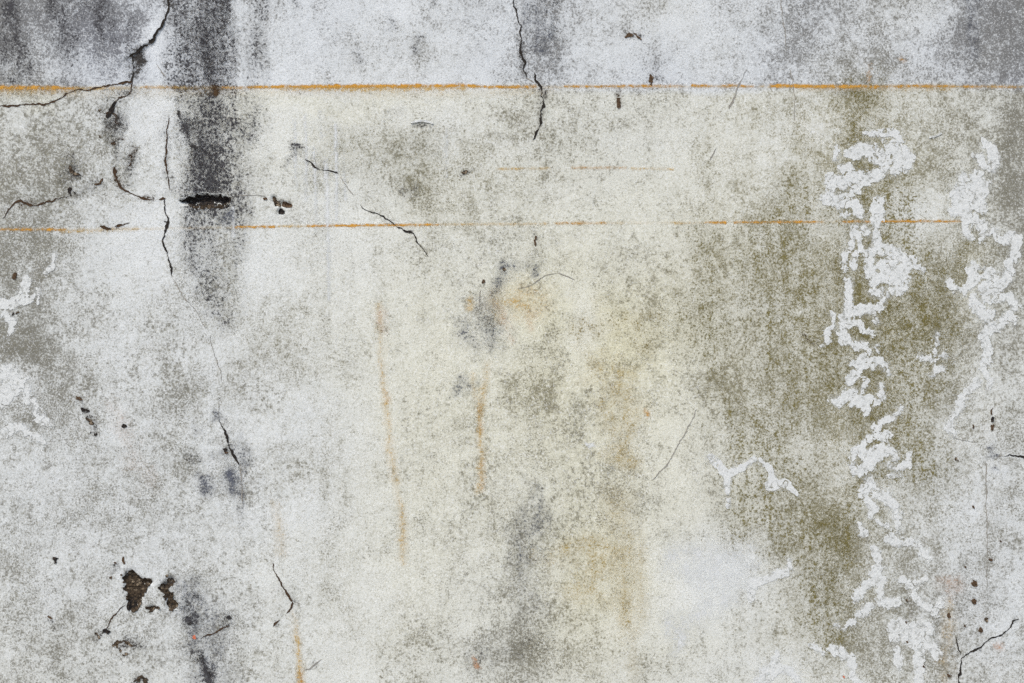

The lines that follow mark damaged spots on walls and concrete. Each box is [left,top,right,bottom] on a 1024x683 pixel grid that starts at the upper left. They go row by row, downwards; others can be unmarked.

leakage [0,0,35,87]
corrosion [0,85,111,94]
crack [0,0,177,114]
leakage [46,0,143,186]
corrosion [163,84,536,97]
crack [513,0,546,140]
spalling [179,193,234,225]
leakage [159,0,267,329]
peeling [943,137,1023,437]
peeling [819,127,948,683]
spalling [109,556,178,613]
crack [955,618,1019,683]